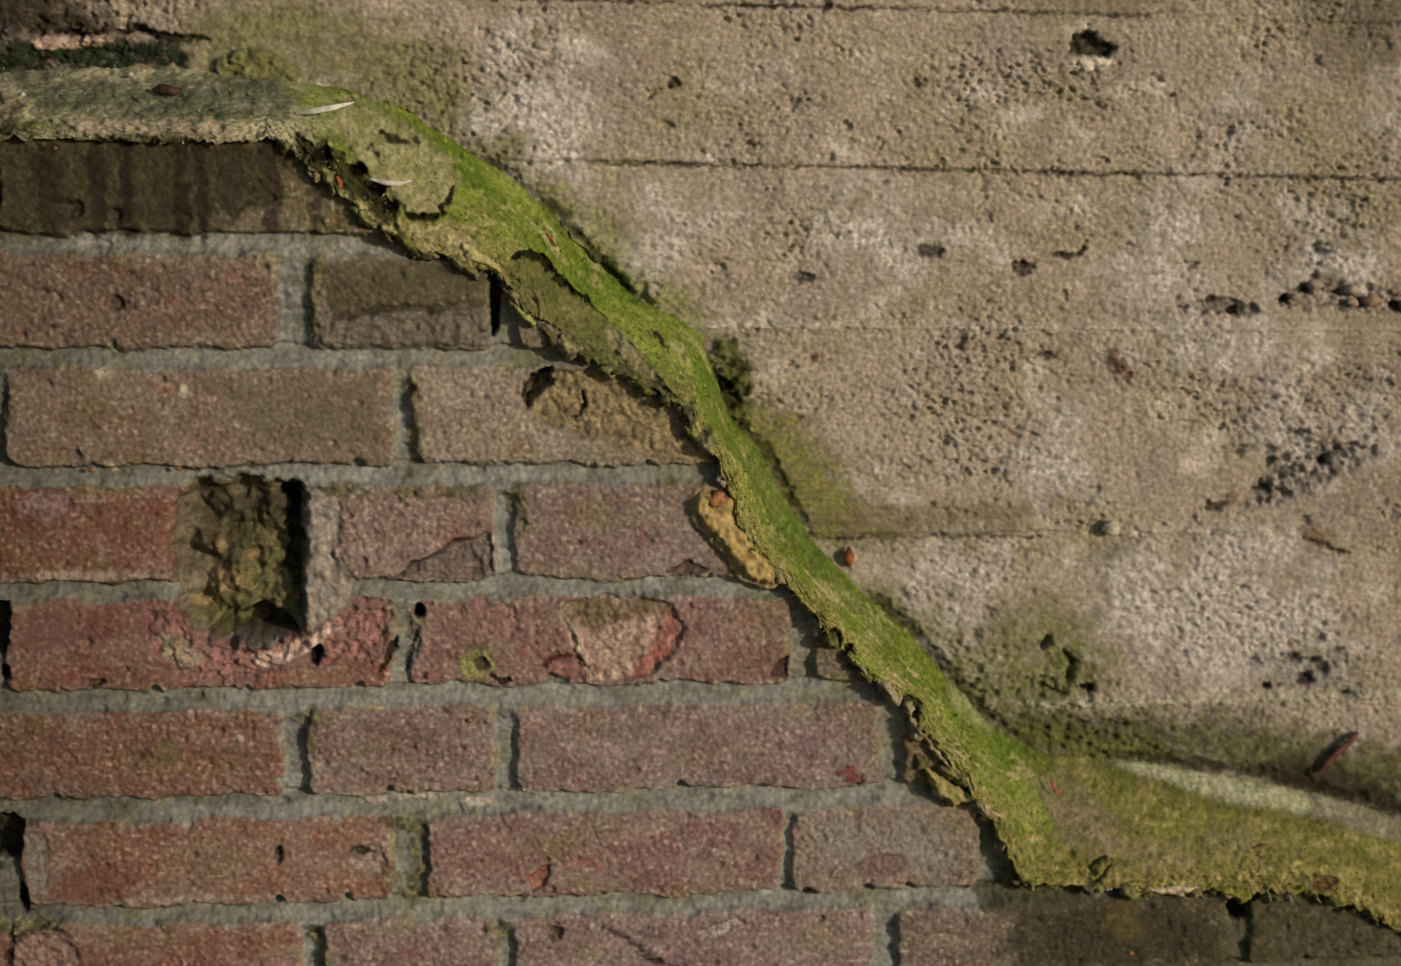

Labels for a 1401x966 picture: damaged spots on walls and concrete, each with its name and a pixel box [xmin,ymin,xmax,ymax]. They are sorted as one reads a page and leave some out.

spalling [62,112,230,138]
water stain [465,30,592,182]
water stain [0,137,400,257]
spalling [319,103,786,587]
water stain [809,179,937,279]
water stain [1114,197,1303,376]
water stain [1286,209,1385,297]
spalling [141,597,392,685]
spalling [546,593,684,681]
water stain [1103,525,1336,683]
peeling [813,615,1003,823]
spalling [13,934,79,966]